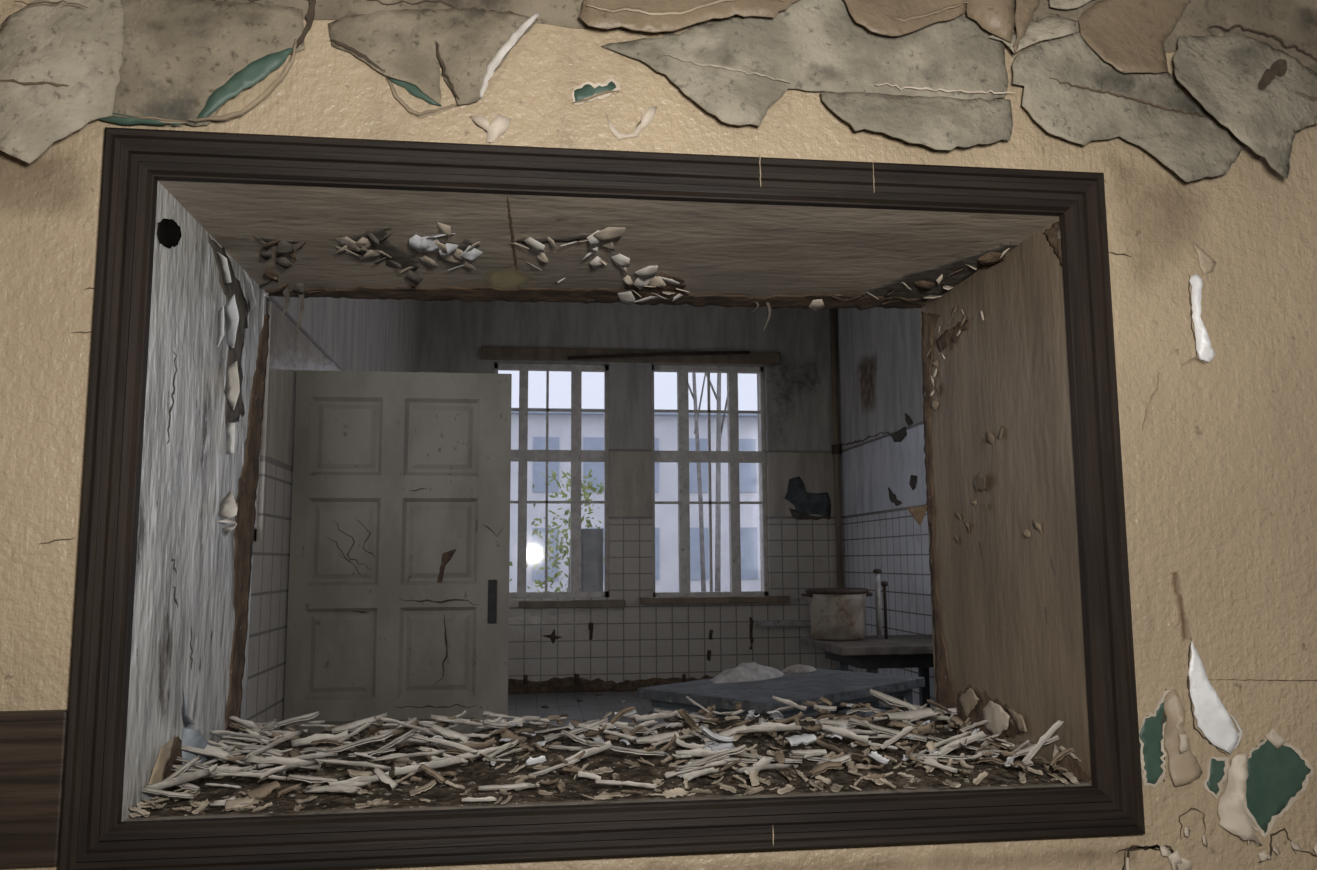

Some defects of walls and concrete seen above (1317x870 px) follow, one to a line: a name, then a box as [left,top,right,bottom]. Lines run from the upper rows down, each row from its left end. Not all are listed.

peeling [1181,242,1216,366]
flaking render [141,221,1092,806]
peeling [1139,637,1314,846]